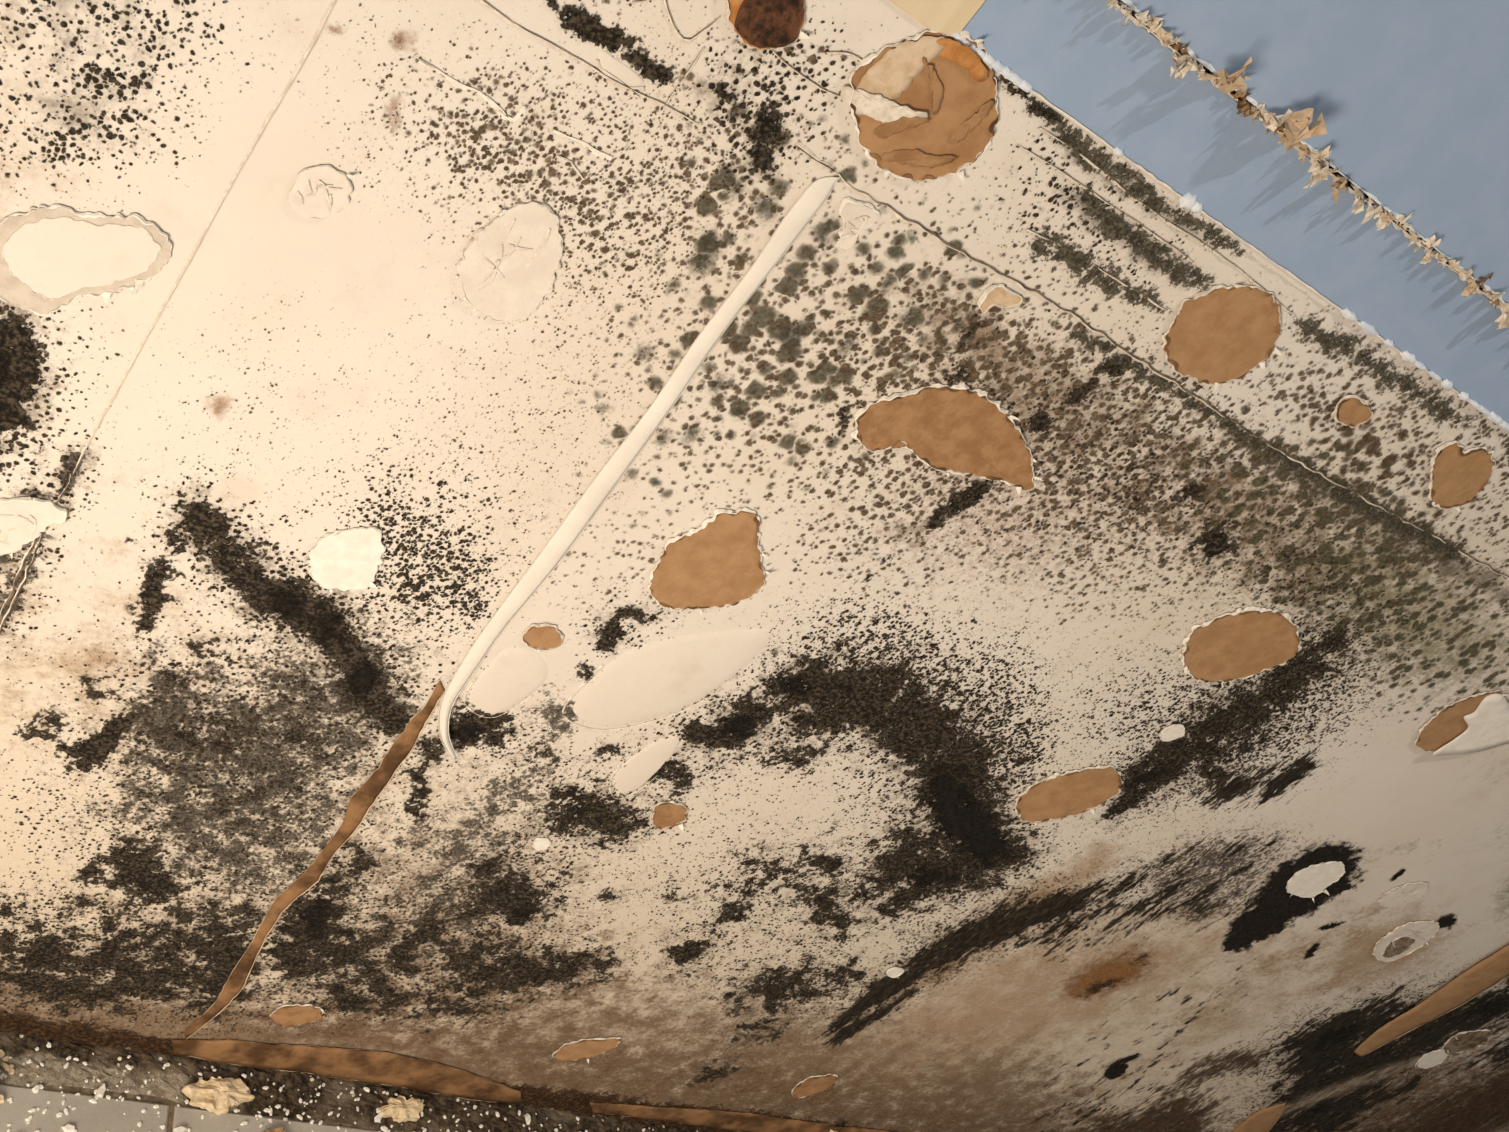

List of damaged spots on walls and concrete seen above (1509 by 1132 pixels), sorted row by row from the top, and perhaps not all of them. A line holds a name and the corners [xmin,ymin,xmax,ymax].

peeling [725,0,810,50]
water stain [0,0,273,198]
peeling [840,30,999,183]
peeling [1162,285,1282,394]
water stain [0,305,124,523]
water stain [598,416,627,454]
water stain [628,447,675,500]
peeling [850,382,1043,495]
water stain [0,528,65,660]
water stain [551,512,690,683]
peeling [648,507,772,615]
peeling [1286,861,1345,901]